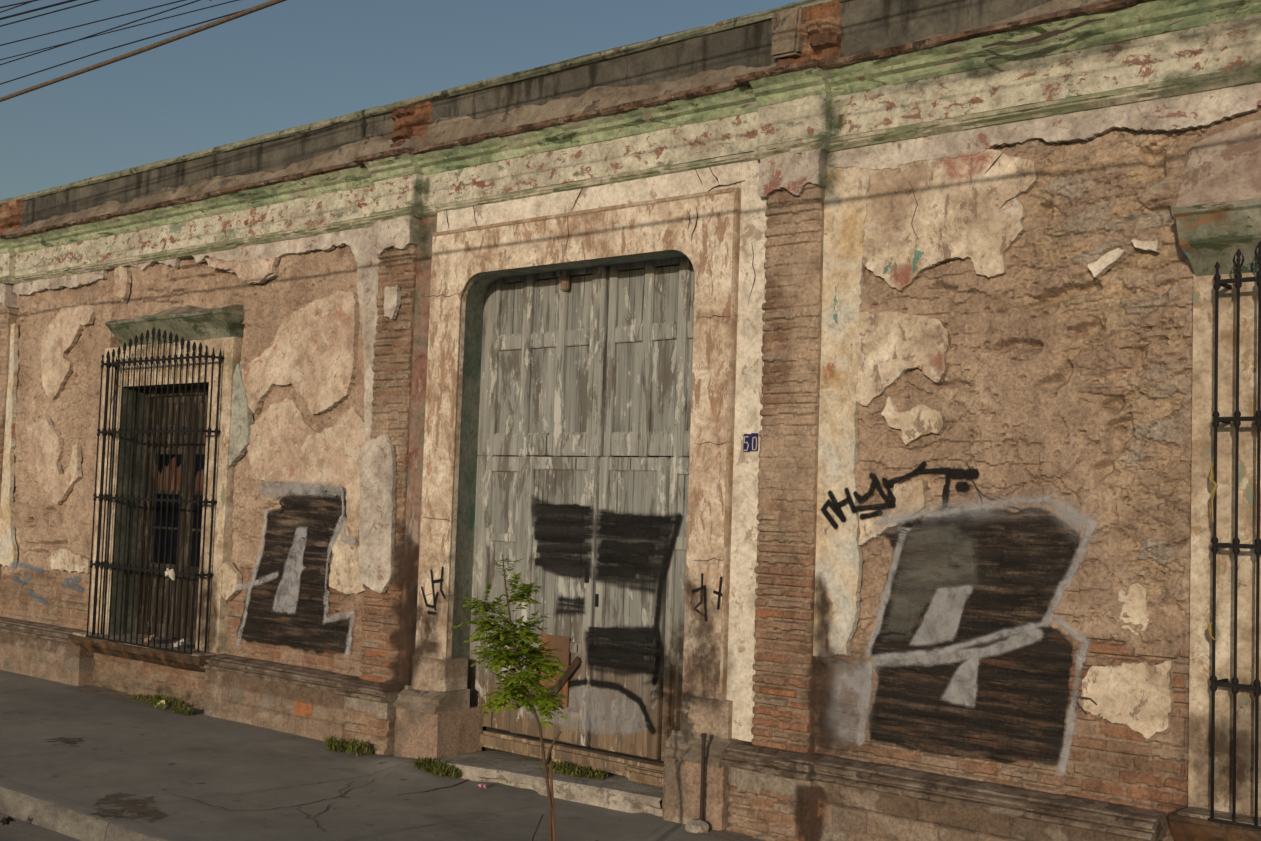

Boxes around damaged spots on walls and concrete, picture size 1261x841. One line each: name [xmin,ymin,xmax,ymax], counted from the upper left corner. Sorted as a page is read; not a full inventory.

spalling [0,226,401,677]
spalling [813,82,1261,816]